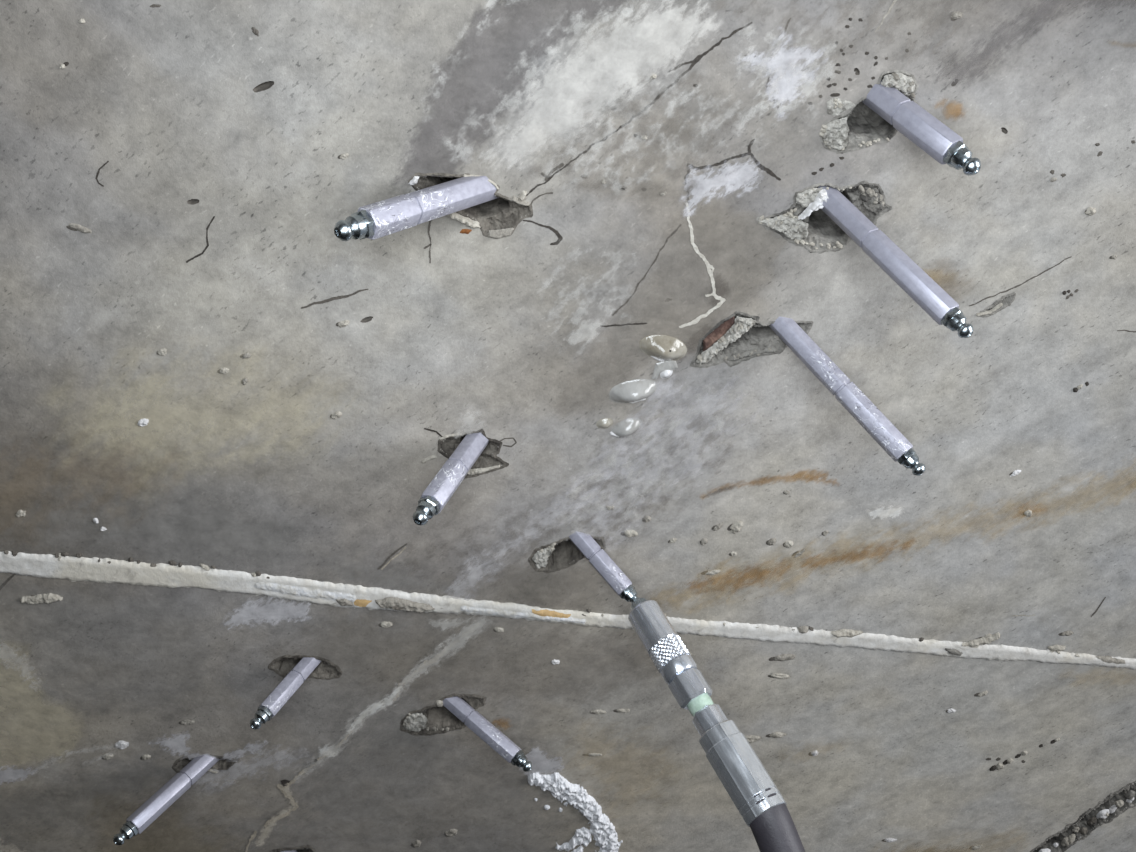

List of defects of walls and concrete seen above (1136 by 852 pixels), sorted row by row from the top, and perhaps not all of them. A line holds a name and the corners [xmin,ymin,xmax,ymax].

water stain [406,0,618,177]
water stain [743,32,822,116]
spalling [877,70,919,103]
crack [523,18,791,245]
spalling [819,95,897,154]
crack [600,139,781,328]
water stain [681,164,758,216]
spalling [756,181,892,254]
spalling [690,311,787,368]
spalling [795,321,813,334]
spalling [421,429,509,479]
spalling [528,537,585,573]